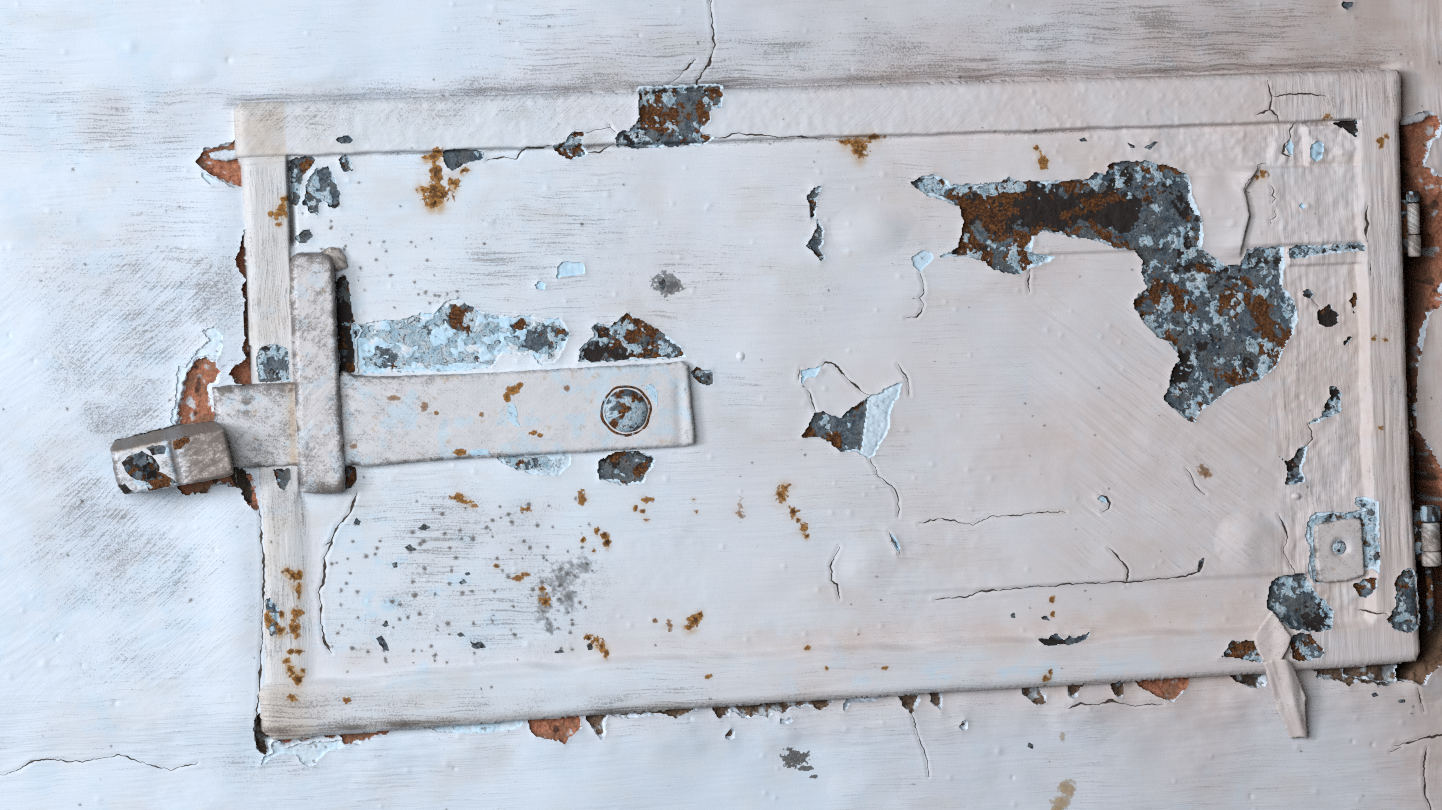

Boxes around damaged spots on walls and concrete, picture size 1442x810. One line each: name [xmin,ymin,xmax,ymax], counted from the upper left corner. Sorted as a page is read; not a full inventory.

crack [667,0,716,85]
peeling [615,84,724,149]
peeling [289,135,353,243]
corrosion [415,146,470,209]
peeling [336,275,714,386]
peeling [910,140,1366,424]
spalling [1267,111,1442,688]
corrosion [580,527,612,552]
corrosion [264,568,305,702]
corrosion [652,611,703,632]
crack [9,754,198,773]
crack [1390,688,1442,810]